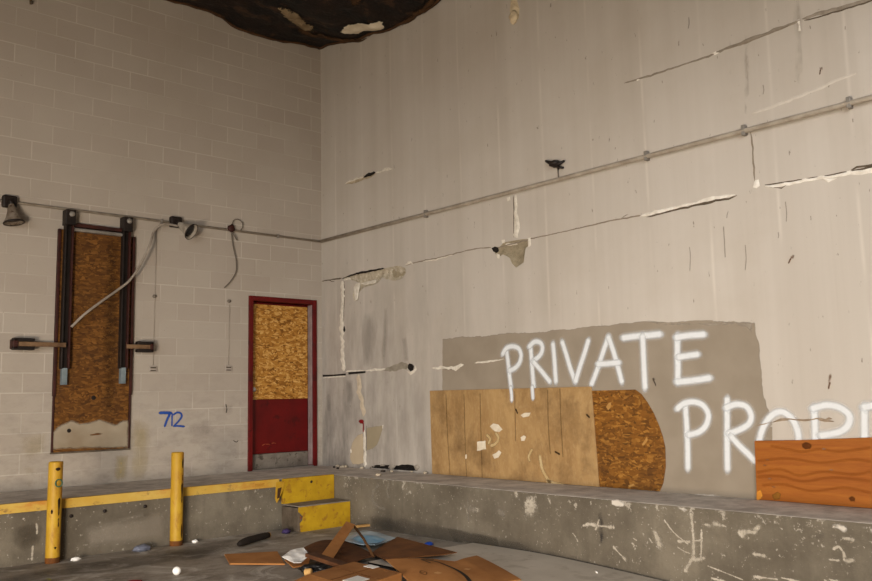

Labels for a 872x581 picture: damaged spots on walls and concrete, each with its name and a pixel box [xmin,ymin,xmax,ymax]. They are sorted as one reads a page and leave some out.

peeling [278,8,314,31]
peeling [342,21,384,34]
spalling [492,237,531,267]
spalling [342,266,406,301]